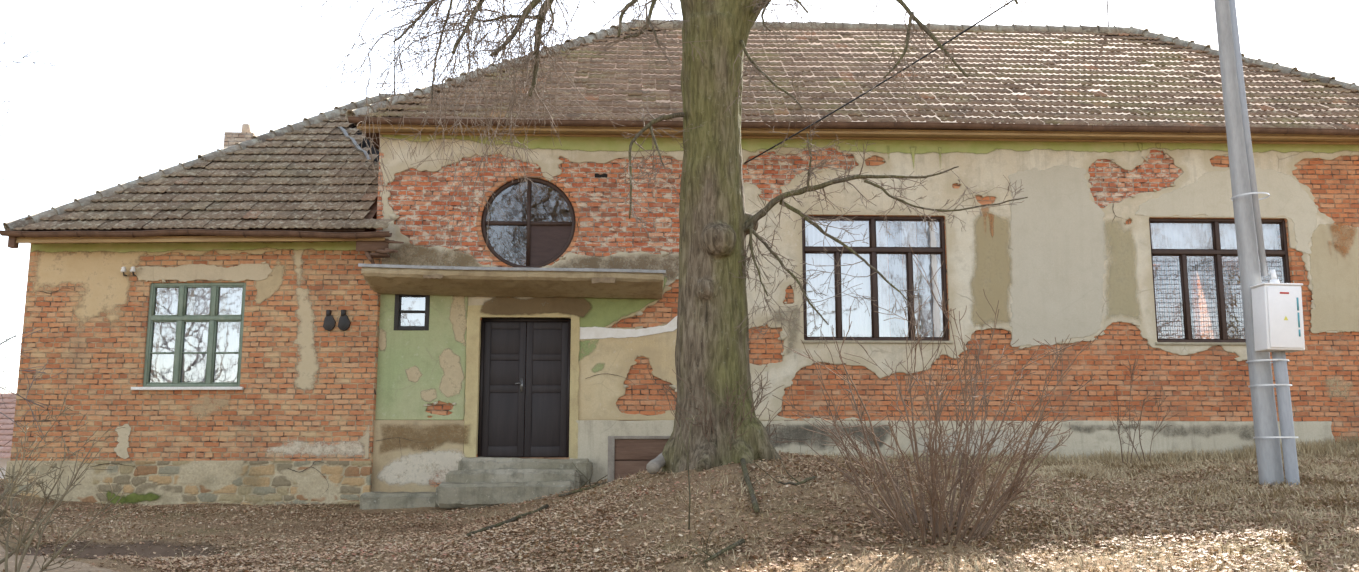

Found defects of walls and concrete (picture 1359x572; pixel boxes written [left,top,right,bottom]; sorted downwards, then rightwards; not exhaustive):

flaking render [376,152,683,267]
flaking render [742,147,885,202]
flaking render [1088,149,1183,208]
spalling [1210,154,1229,167]
flaking render [1292,155,1359,227]
flaking render [609,276,679,330]
peeling [406,348,464,418]
flaking render [616,357,677,416]
flaking render [749,324,787,367]
flaking render [778,322,1253,421]
flaking render [1270,248,1359,443]